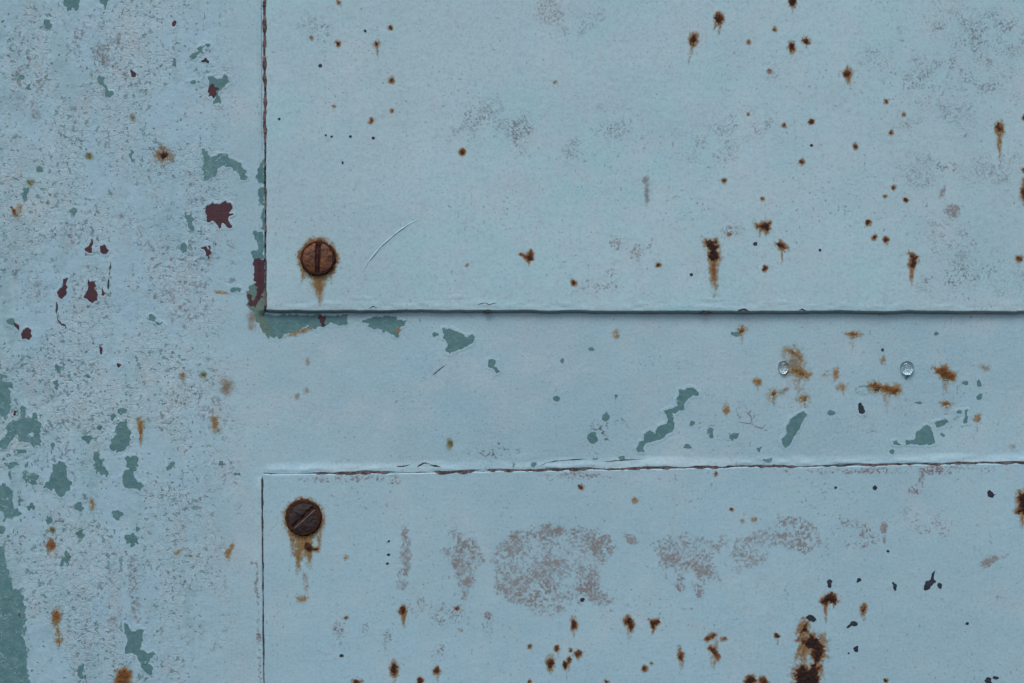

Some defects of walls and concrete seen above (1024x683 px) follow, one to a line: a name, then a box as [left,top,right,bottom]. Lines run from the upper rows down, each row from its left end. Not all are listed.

peeling [178,197,237,261]
peeling [199,144,409,343]
corrosion [704,233,731,289]
peeling [432,324,477,357]
peeling [618,384,702,460]
peeling [757,409,810,463]
corrosion [868,382,902,399]
corrosion [931,364,956,385]
peeling [0,369,84,683]
corrosion [283,497,325,568]
corrosion [820,592,839,619]
corrosion [792,617,827,683]